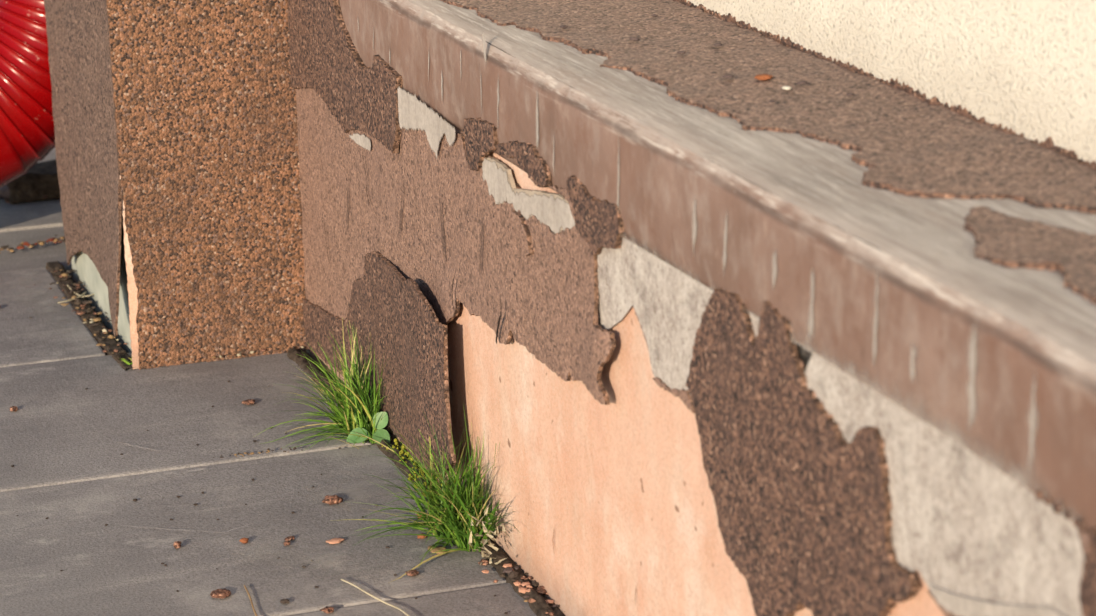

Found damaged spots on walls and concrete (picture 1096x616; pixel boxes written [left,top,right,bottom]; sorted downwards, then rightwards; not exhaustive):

peeling [440,0,1096,304]
spalling [288,0,955,616]
peeling [1035,489,1096,616]